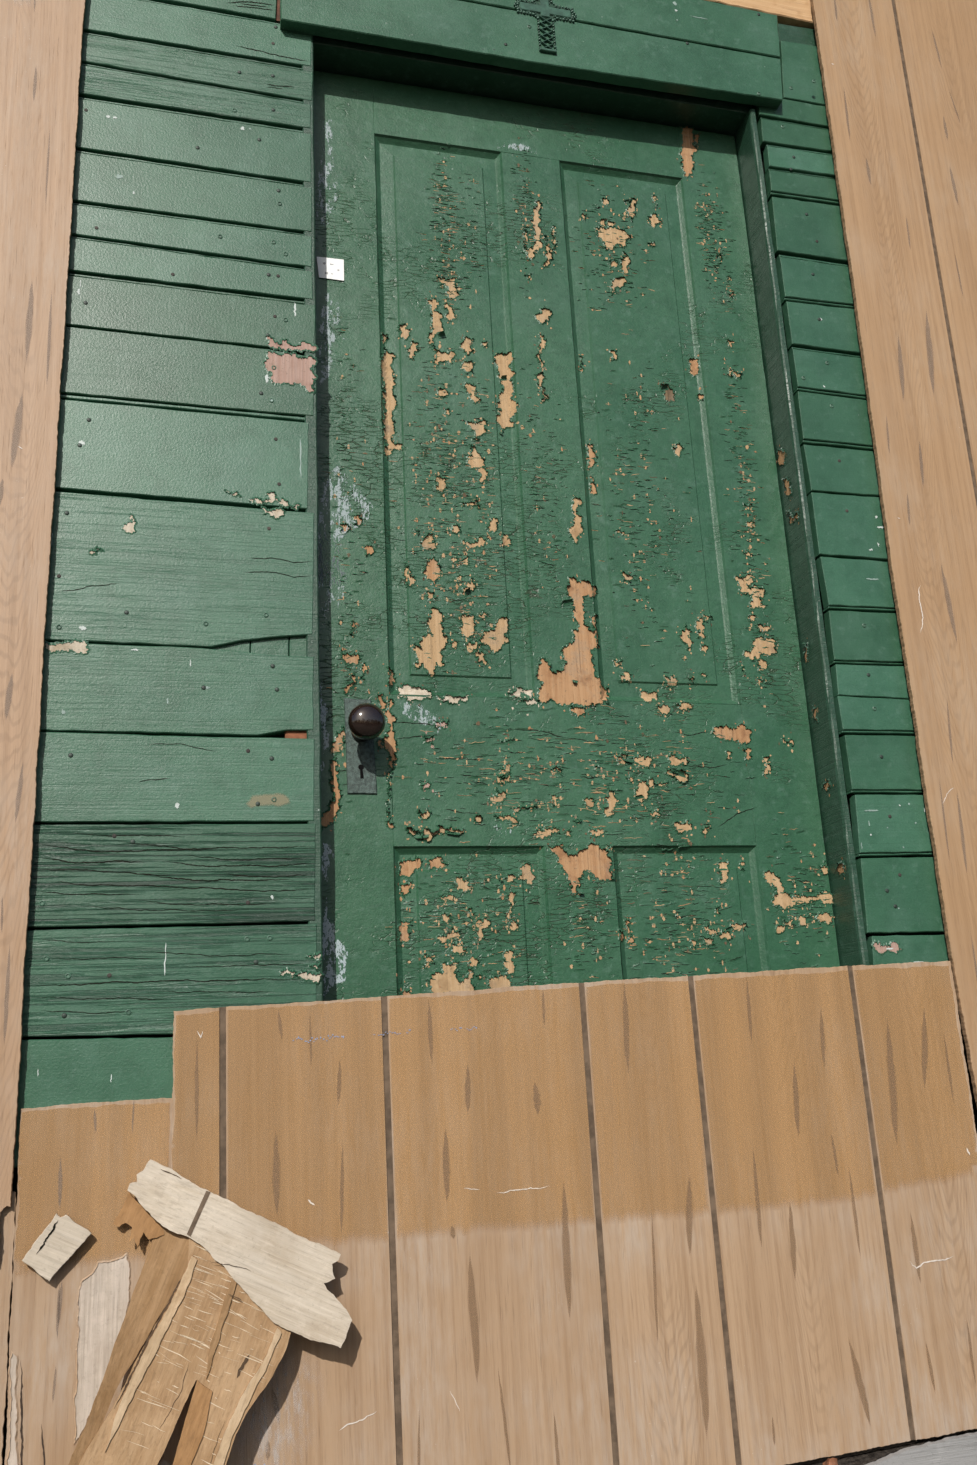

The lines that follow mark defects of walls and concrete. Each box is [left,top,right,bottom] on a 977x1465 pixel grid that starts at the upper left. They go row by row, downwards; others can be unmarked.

peeling [677,125,701,181]
peeling [520,200,558,283]
peeling [579,193,663,296]
peeling [262,334,319,394]
peeling [224,489,302,520]
crack [254,137,830,988]
peeling [336,275,715,995]
peeling [733,550,778,689]
peeling [321,726,345,832]
peeling [705,721,795,778]
peeling [687,853,846,958]
crack [20,1363,45,1465]